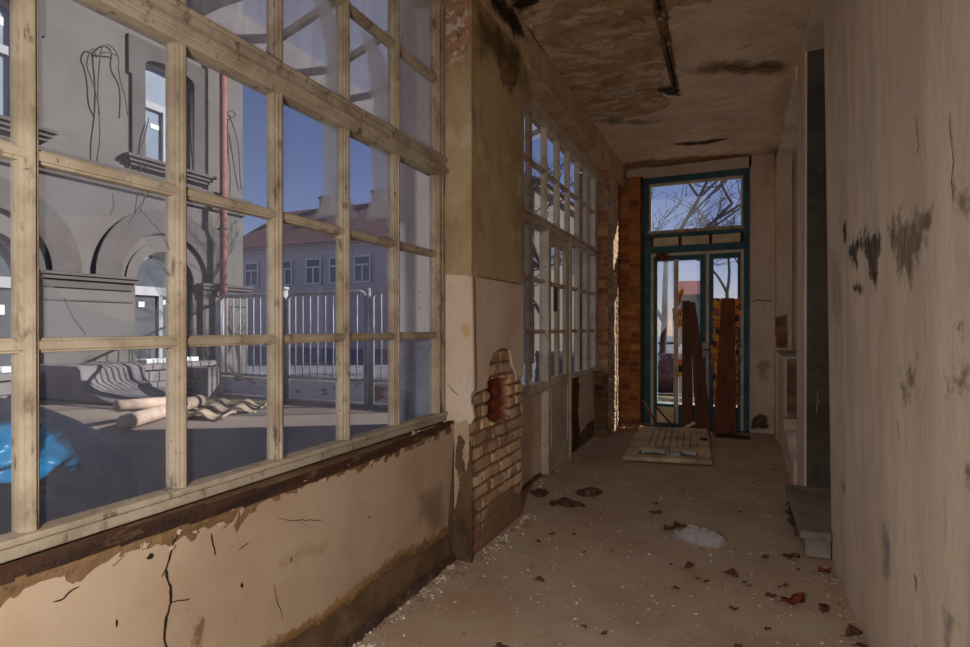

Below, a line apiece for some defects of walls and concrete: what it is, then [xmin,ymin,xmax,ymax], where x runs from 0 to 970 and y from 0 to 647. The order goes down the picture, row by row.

damp [445,0,538,85]
peeling [513,0,712,118]
damp [843,211,931,295]
peeling [0,348,523,607]
crack [162,527,189,647]